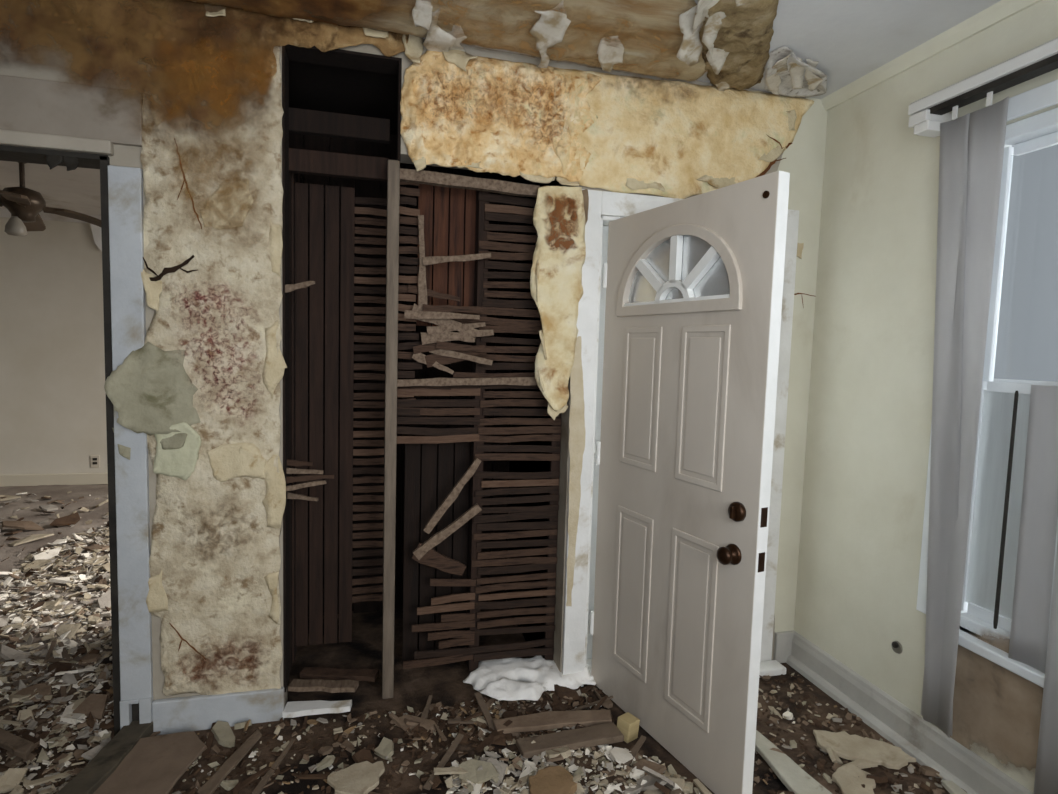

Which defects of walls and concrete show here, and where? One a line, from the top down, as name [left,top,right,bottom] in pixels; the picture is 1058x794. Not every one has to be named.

crack [143,255,197,281]
crack [174,138,202,229]
leakage [0,0,416,227]
peeling [140,46,287,697]
leakage [183,290,255,417]
peeling [358,0,827,606]